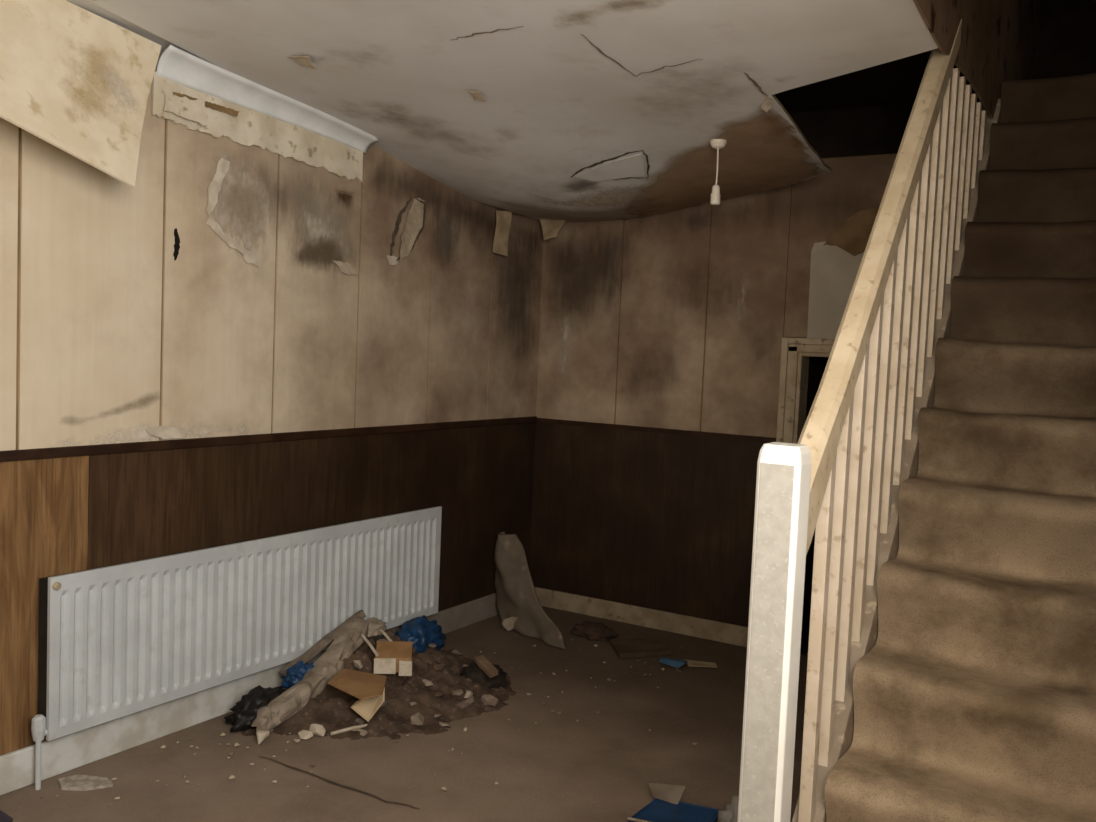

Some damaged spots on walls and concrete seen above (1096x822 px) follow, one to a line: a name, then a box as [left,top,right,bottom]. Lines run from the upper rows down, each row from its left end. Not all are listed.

crack [452,26,524,40]
crack [581,34,703,77]
peeling [173,92,240,117]
peeling [206,155,269,267]
damp [296,189,358,275]